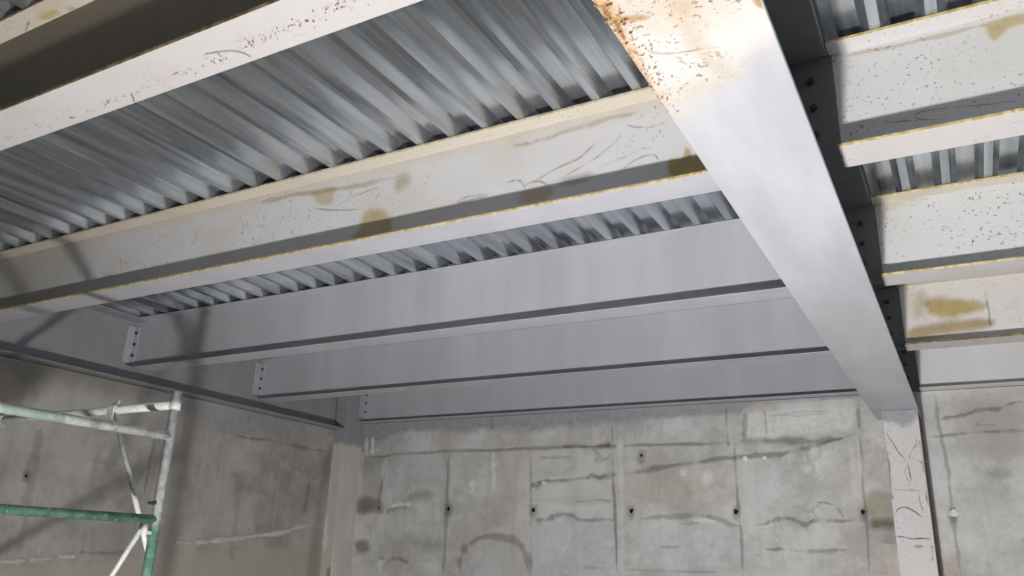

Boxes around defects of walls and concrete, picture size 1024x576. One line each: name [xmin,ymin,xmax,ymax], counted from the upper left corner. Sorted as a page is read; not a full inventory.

rust [593,0,756,125]